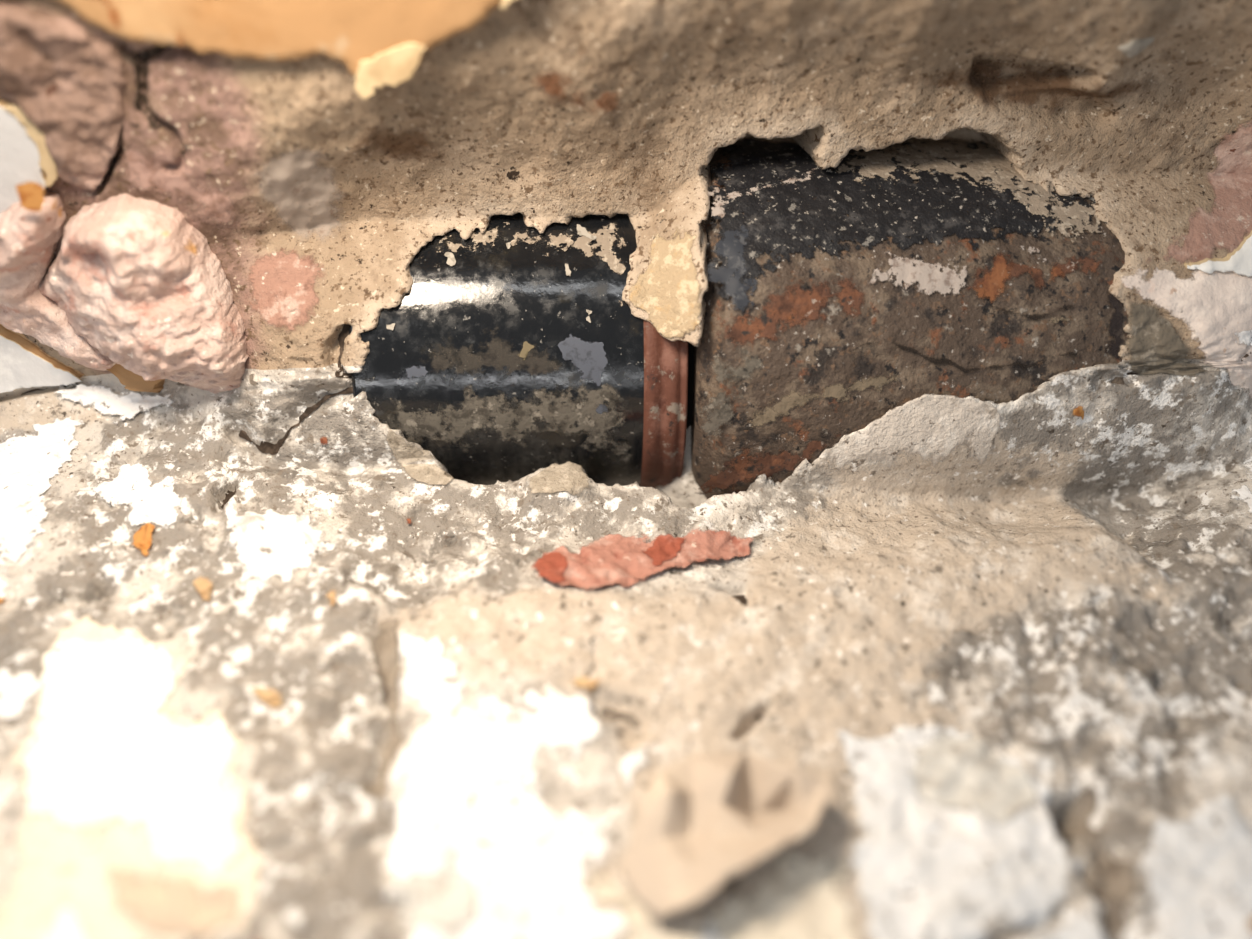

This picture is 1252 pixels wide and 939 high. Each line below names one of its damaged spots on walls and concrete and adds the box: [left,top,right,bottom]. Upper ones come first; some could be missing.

crack [114,43,186,161]
spalling [0,0,1252,398]
corrosion [715,279,865,346]
corrosion [967,249,1124,302]
corrosion [1073,406,1084,420]
peeling [0,333,183,607]
corrosion [684,440,826,498]
peeling [1231,438,1252,529]
peeling [218,487,336,583]
flaking render [532,528,754,590]